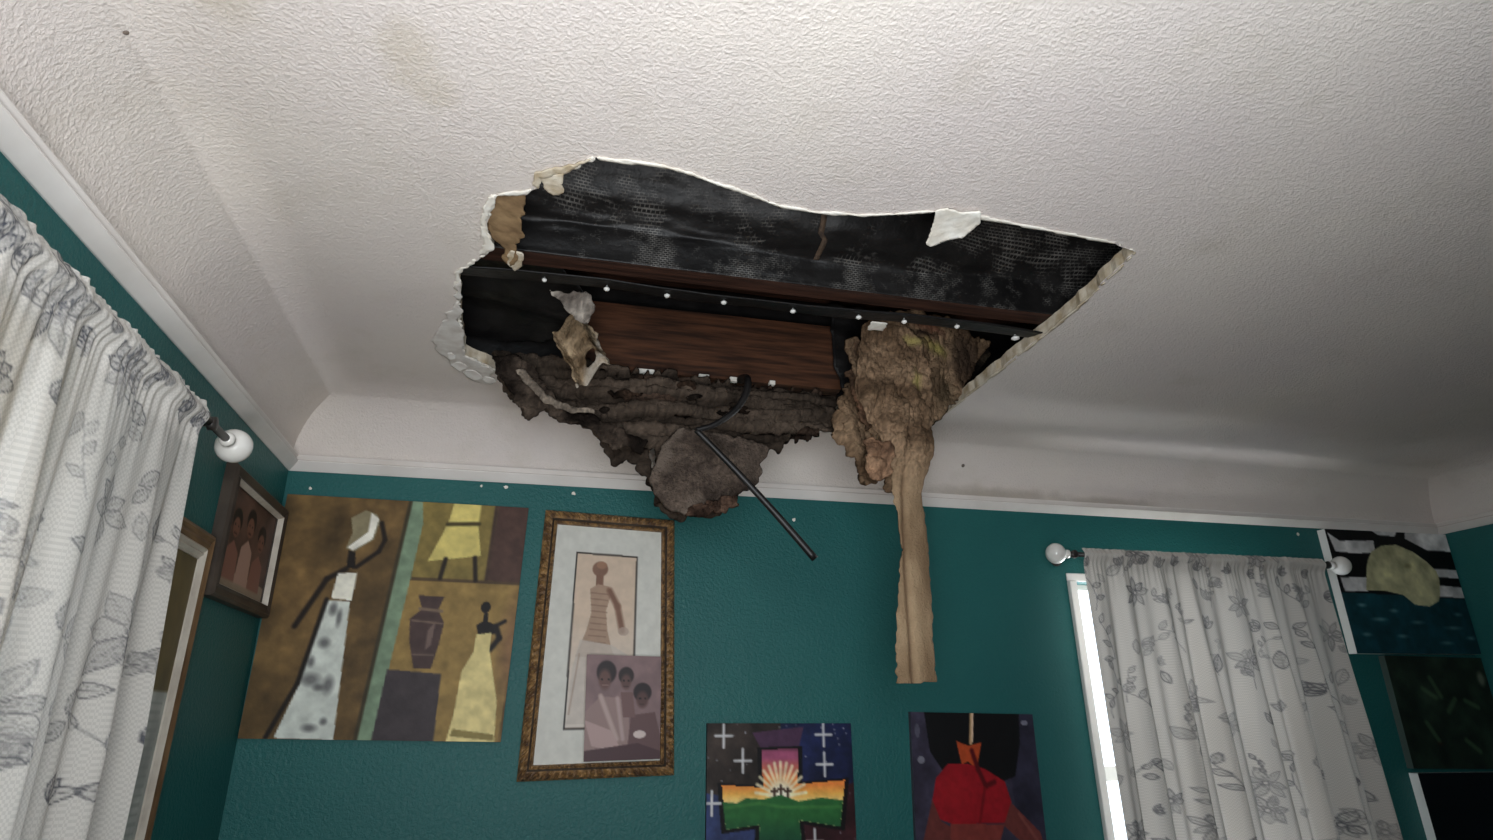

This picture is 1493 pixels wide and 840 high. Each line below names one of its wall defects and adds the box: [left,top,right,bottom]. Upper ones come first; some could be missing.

peeling [532,158,591,196]
peeling [479,196,495,254]
flaking render [926,208,981,247]
peeling [431,281,497,385]